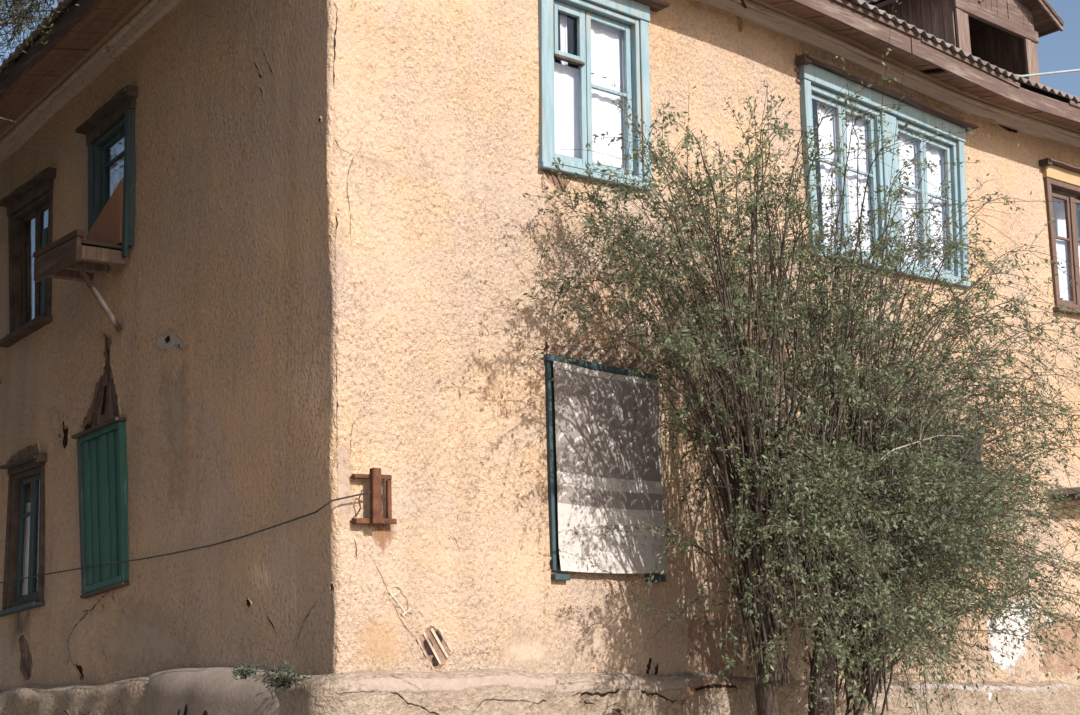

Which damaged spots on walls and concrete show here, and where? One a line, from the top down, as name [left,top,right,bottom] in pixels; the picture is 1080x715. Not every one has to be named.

crack [333,0,400,250]
crack [352,538,416,640]
crack [337,675,440,715]
crack [468,687,685,715]